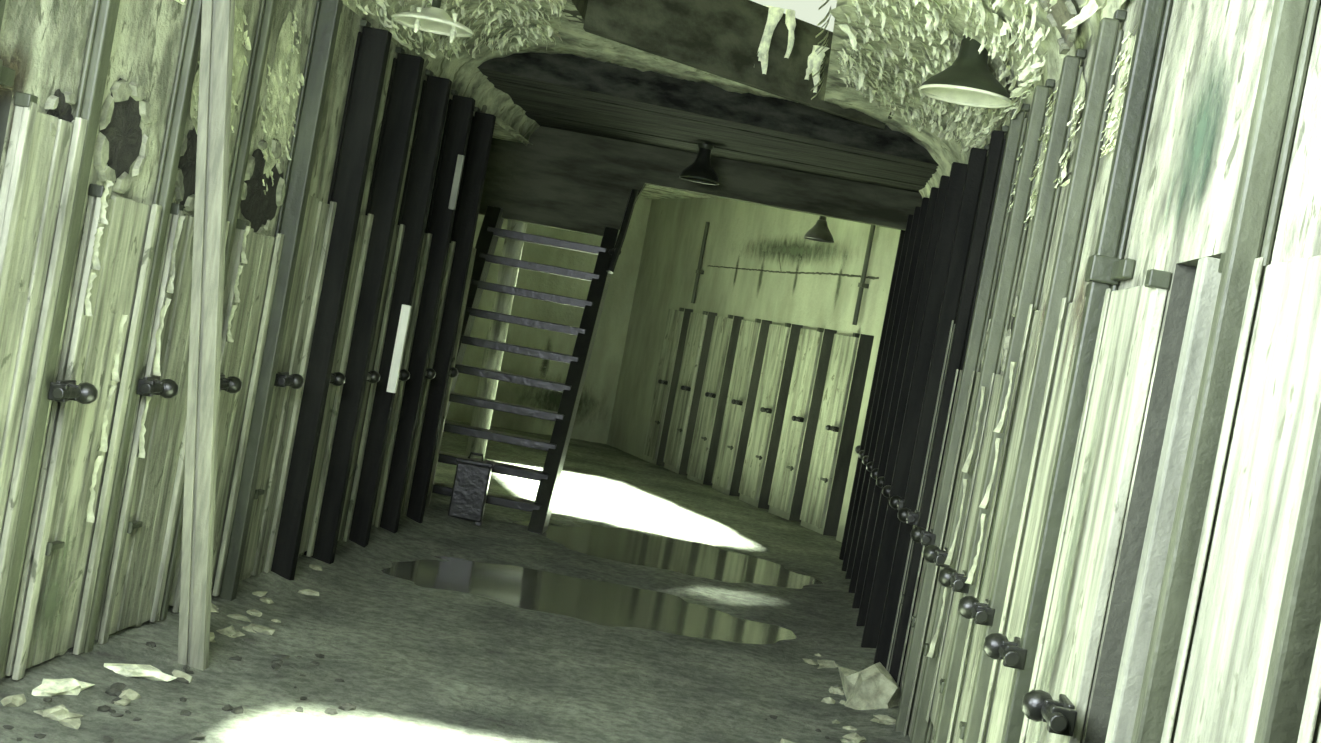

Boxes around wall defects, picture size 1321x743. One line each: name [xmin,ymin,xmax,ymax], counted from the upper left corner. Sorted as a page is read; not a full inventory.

spalling [45,89,77,137]
spalling [84,78,155,317]
spalling [151,61,200,376]
flaking render [226,6,304,343]
flaking render [347,0,567,61]
flaking render [811,0,1126,154]
flaking render [1007,66,1085,230]
flaking render [1099,26,1137,158]
peeling [85,314,128,523]
peeling [137,396,152,458]
peeling [944,293,1019,585]
peeling [927,587,948,658]